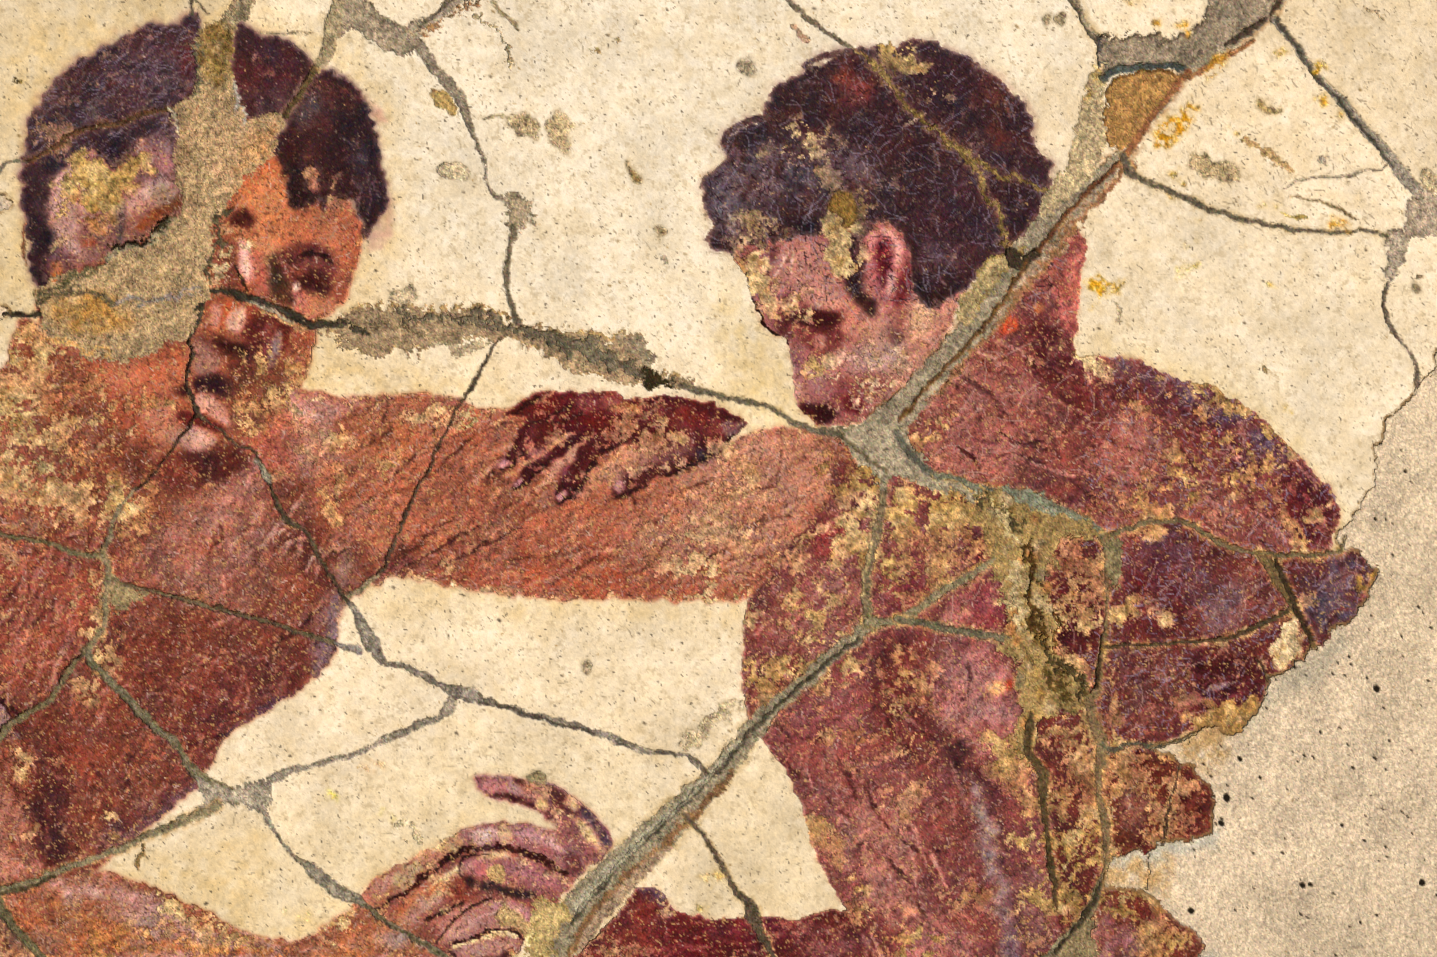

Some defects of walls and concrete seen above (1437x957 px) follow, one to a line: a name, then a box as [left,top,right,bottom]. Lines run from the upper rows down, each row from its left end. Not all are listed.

crack [190,0,211,17]
crack [262,0,540,327]
spalling [0,0,286,543]
crack [203,206,341,330]
crack [678,0,1437,643]
peeling [1184,382,1301,462]
peeling [1262,486,1331,555]
crack [0,301,873,957]
peeling [1269,615,1307,670]
crack [1010,488,1347,957]
peeling [1181,695,1261,736]
peeling [1125,917,1193,957]